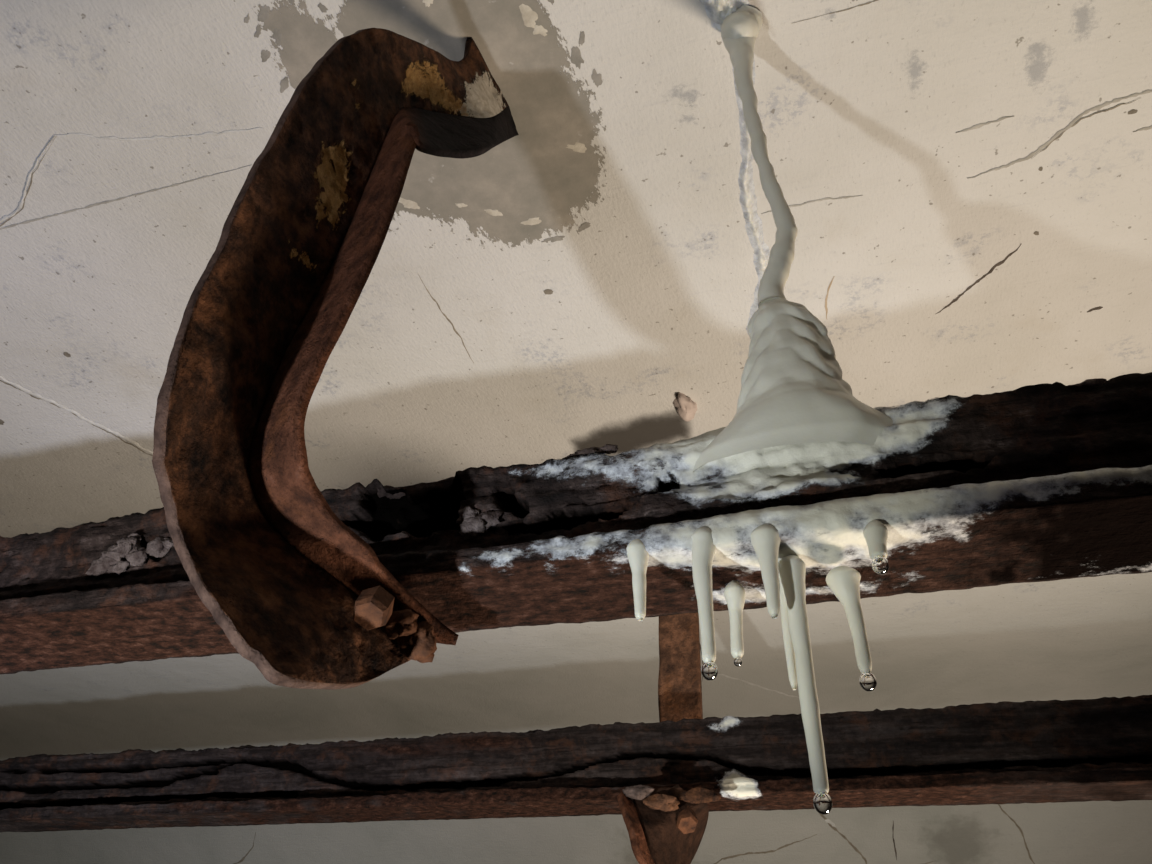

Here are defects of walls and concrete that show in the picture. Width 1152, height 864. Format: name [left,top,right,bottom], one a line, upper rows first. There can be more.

spalling [244,0,606,251]
crack [0,127,263,227]
crack [0,376,153,456]
water stain [575,414,688,455]
crack [714,814,867,864]
crack [998,804,1035,864]